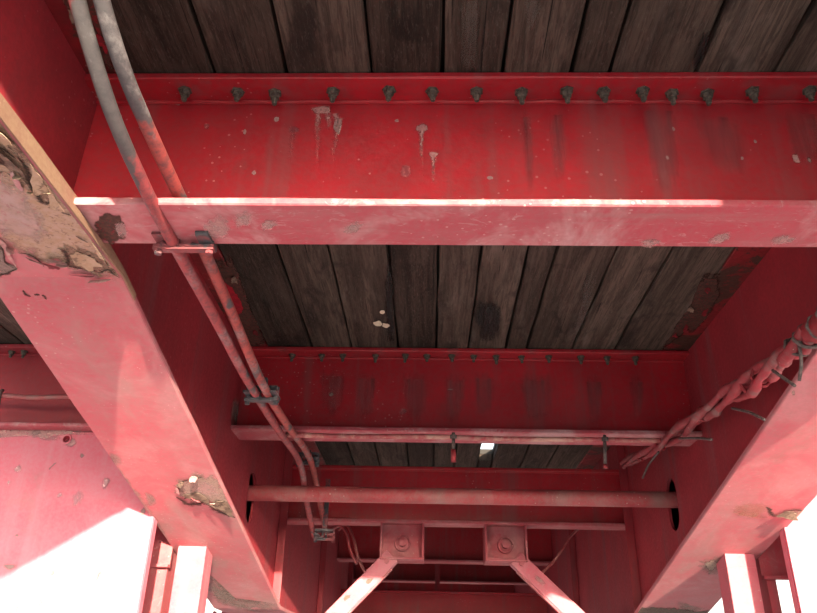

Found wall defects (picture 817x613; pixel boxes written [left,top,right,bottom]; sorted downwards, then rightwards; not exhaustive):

peeling [0,123,118,284]